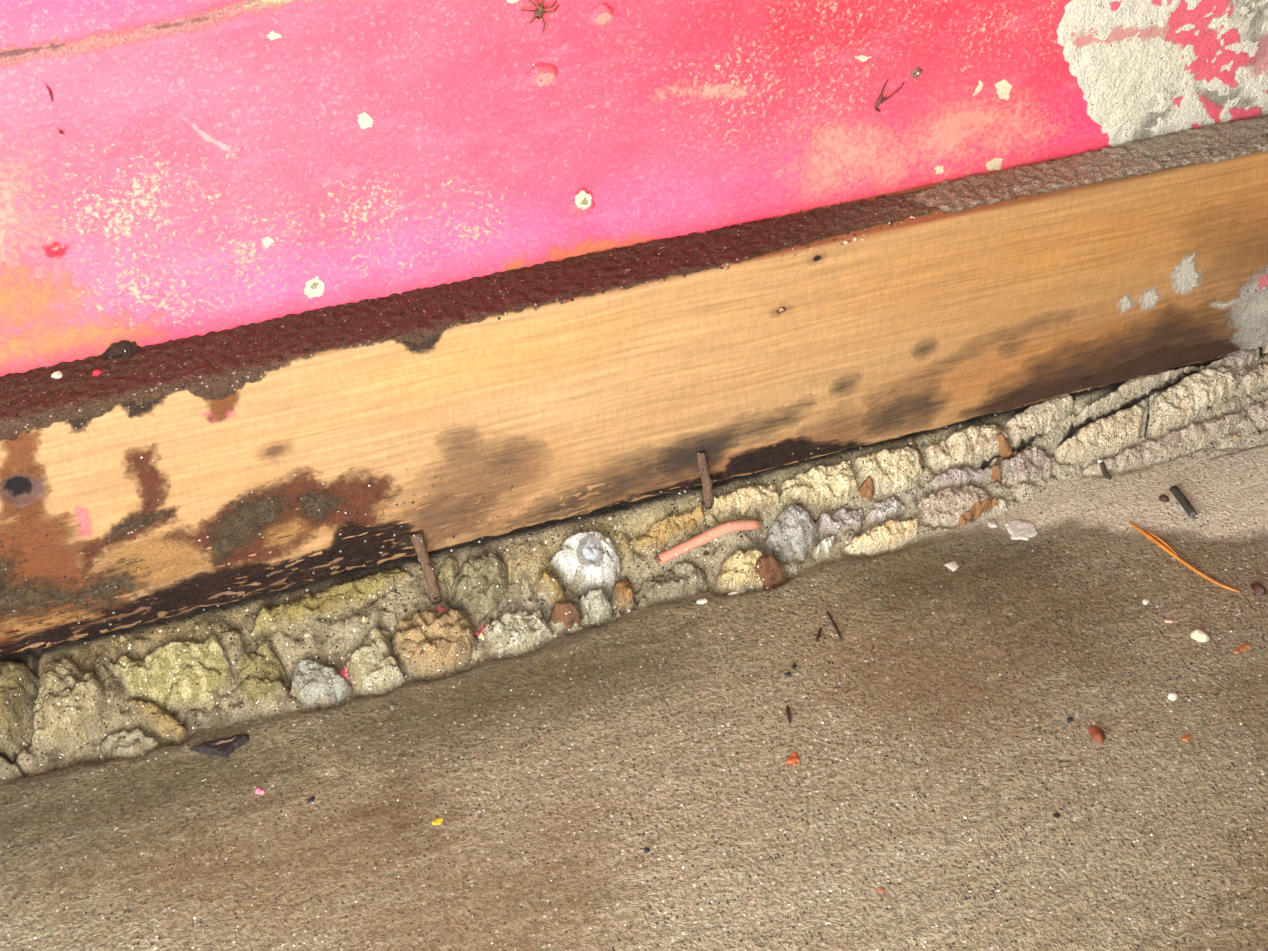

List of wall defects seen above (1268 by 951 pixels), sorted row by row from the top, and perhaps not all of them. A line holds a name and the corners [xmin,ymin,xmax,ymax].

crack [0,0,313,67]
peeling [653,0,1268,200]
damp [968,293,1268,414]
damp [540,417,866,519]
damp [875,395,939,428]
crack [980,372,1198,469]
damp [0,521,1268,951]